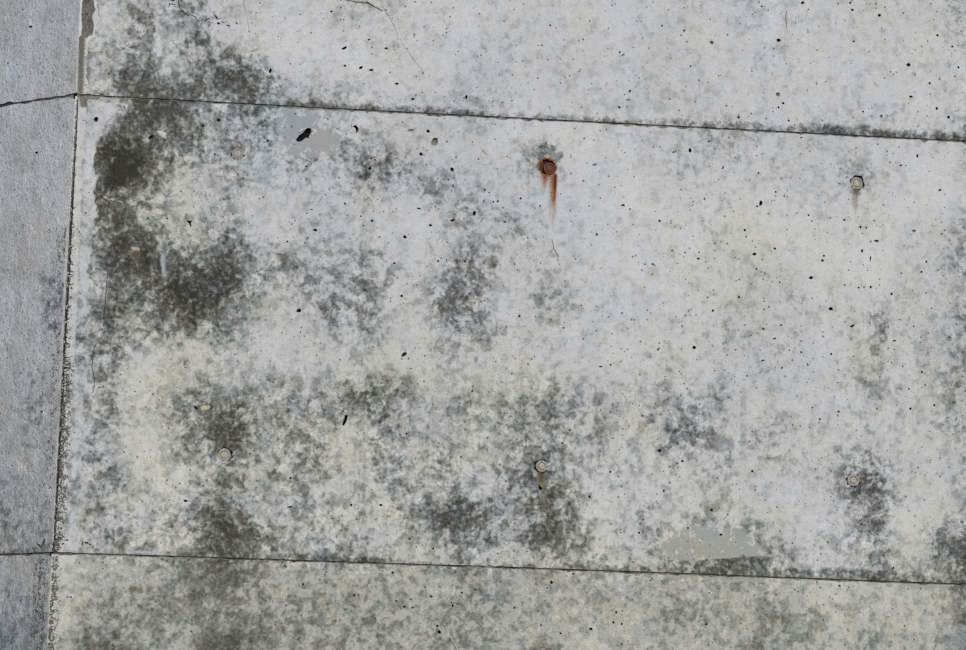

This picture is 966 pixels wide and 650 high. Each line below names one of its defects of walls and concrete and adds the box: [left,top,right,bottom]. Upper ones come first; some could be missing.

damp [111,1,966,140]
corrosion [538,157,557,205]
damp [67,94,966,650]